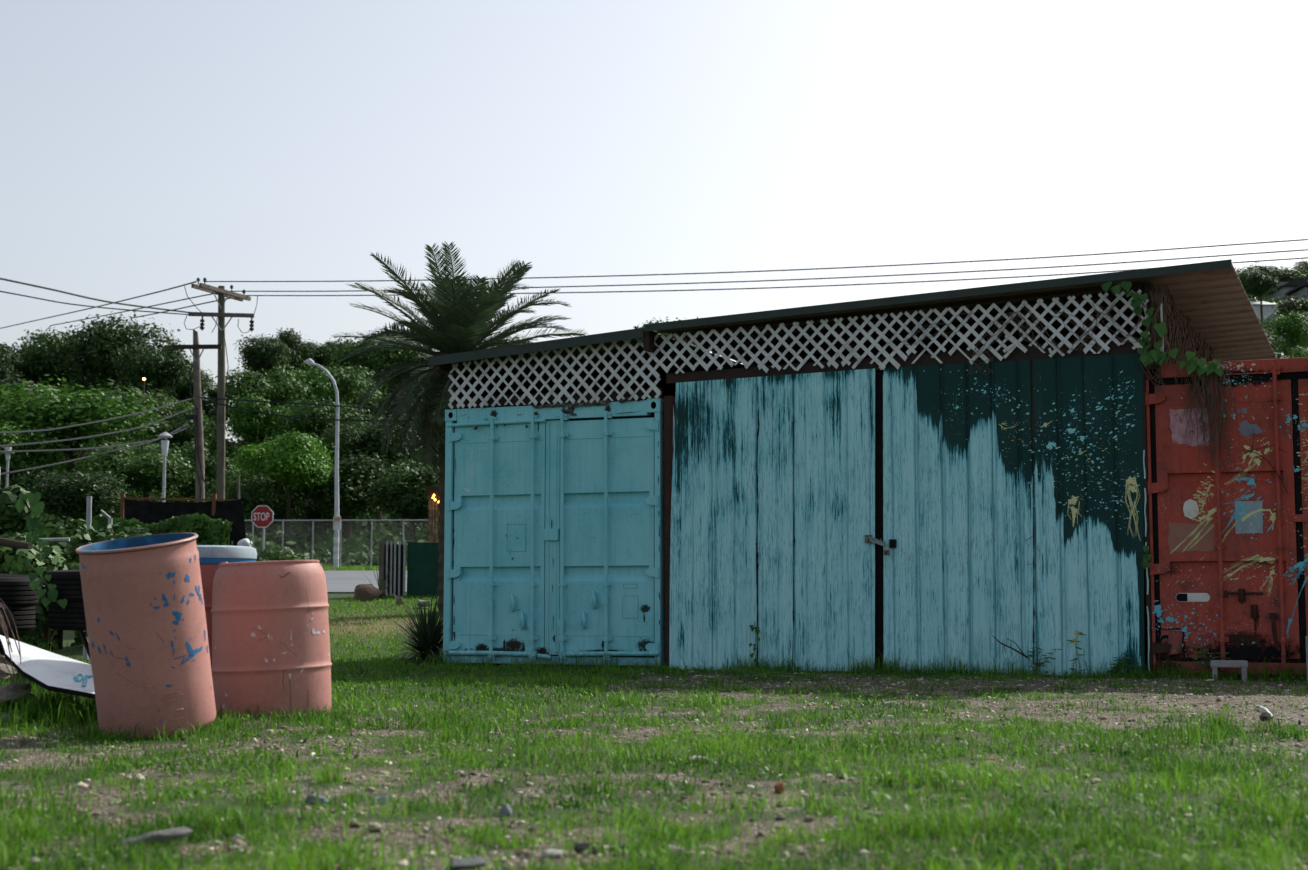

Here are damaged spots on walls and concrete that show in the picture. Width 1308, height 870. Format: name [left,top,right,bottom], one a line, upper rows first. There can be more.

rust [503,638,549,654]
rust [1225,618,1271,653]